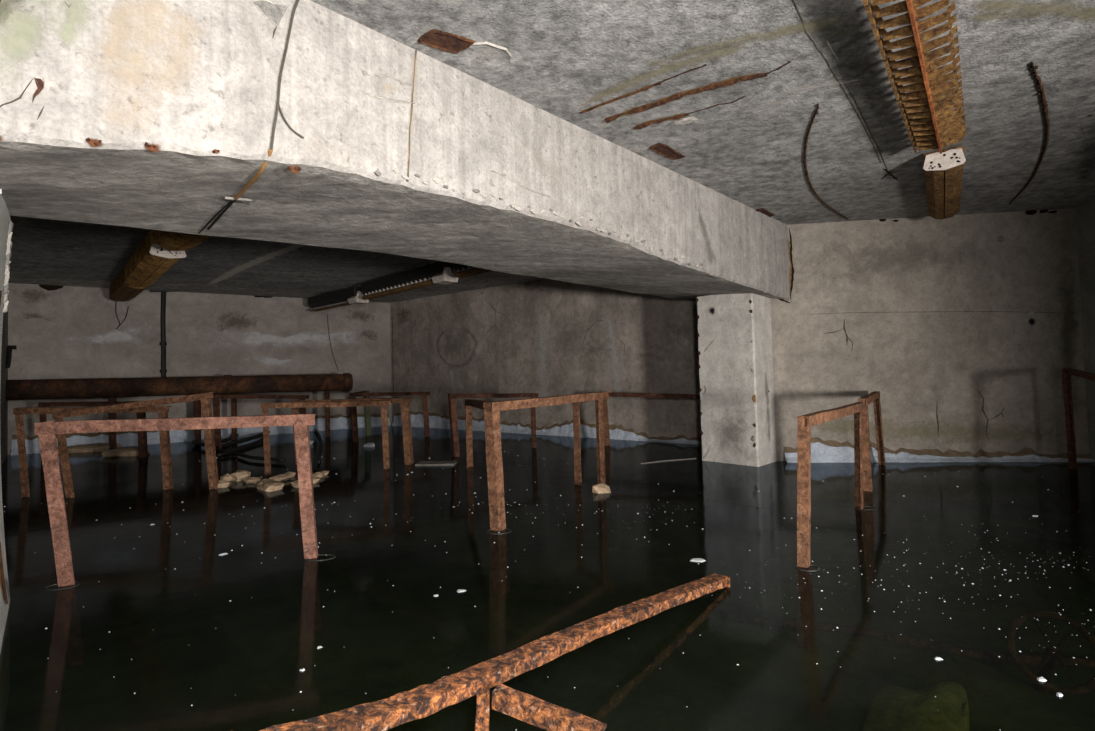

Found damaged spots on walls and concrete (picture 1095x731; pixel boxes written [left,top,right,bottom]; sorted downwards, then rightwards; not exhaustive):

crack [407,50,417,182]
leakage [309,411,485,432]
leakage [500,419,596,438]
leakage [609,424,702,445]
leakage [784,447,798,463]
leakage [811,437,854,463]
leakage [870,441,1095,462]